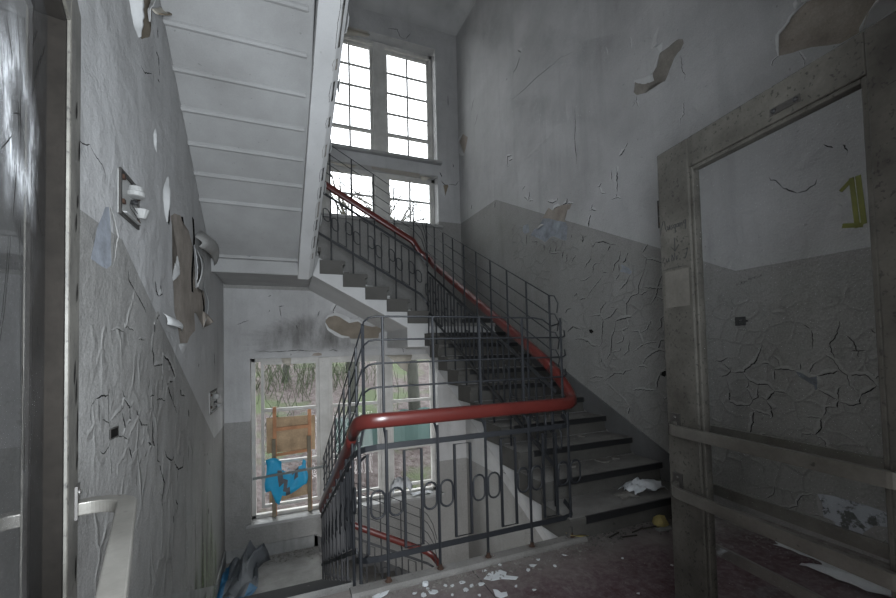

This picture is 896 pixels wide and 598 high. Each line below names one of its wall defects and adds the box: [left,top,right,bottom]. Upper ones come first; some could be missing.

peeling [129,0,172,39]
peeling [634,27,684,95]
peeling [775,0,876,56]
peeling [91,206,119,269]
peeling [163,176,219,354]
crack [526,198,664,360]
peeling [325,313,381,345]
crack [90,271,210,522]
crack [715,321,879,448]
peeling [817,494,887,534]